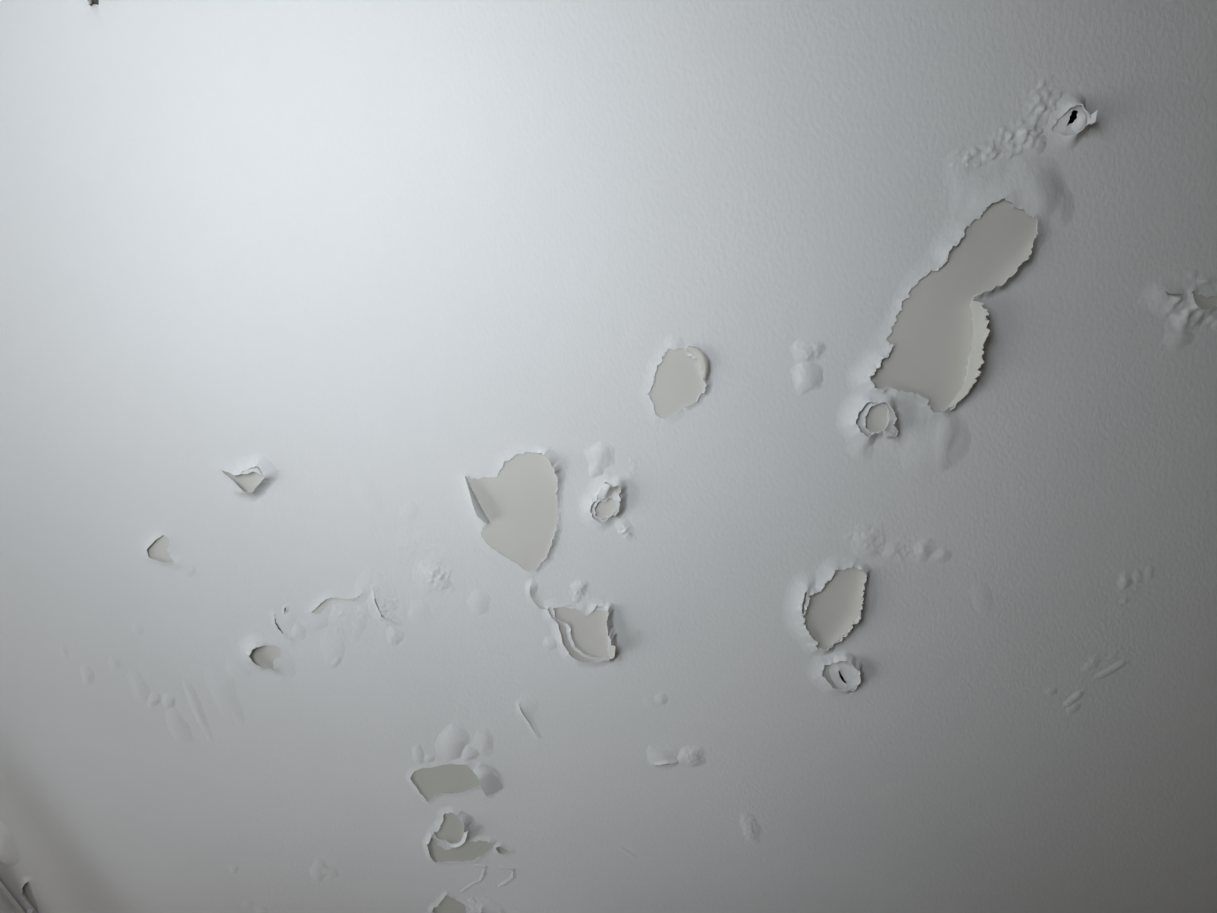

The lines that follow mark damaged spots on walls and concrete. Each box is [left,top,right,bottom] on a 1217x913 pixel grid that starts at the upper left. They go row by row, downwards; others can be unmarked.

peeling [73,0,135,38]
peeling [835,89,1098,479]
peeling [638,334,713,428]
peeling [208,452,279,503]
peeling [138,524,201,580]
peeling [456,442,635,669]
peeling [224,630,297,684]
peeling [783,555,872,697]
peeling [0,822,46,913]
peeling [405,758,517,913]